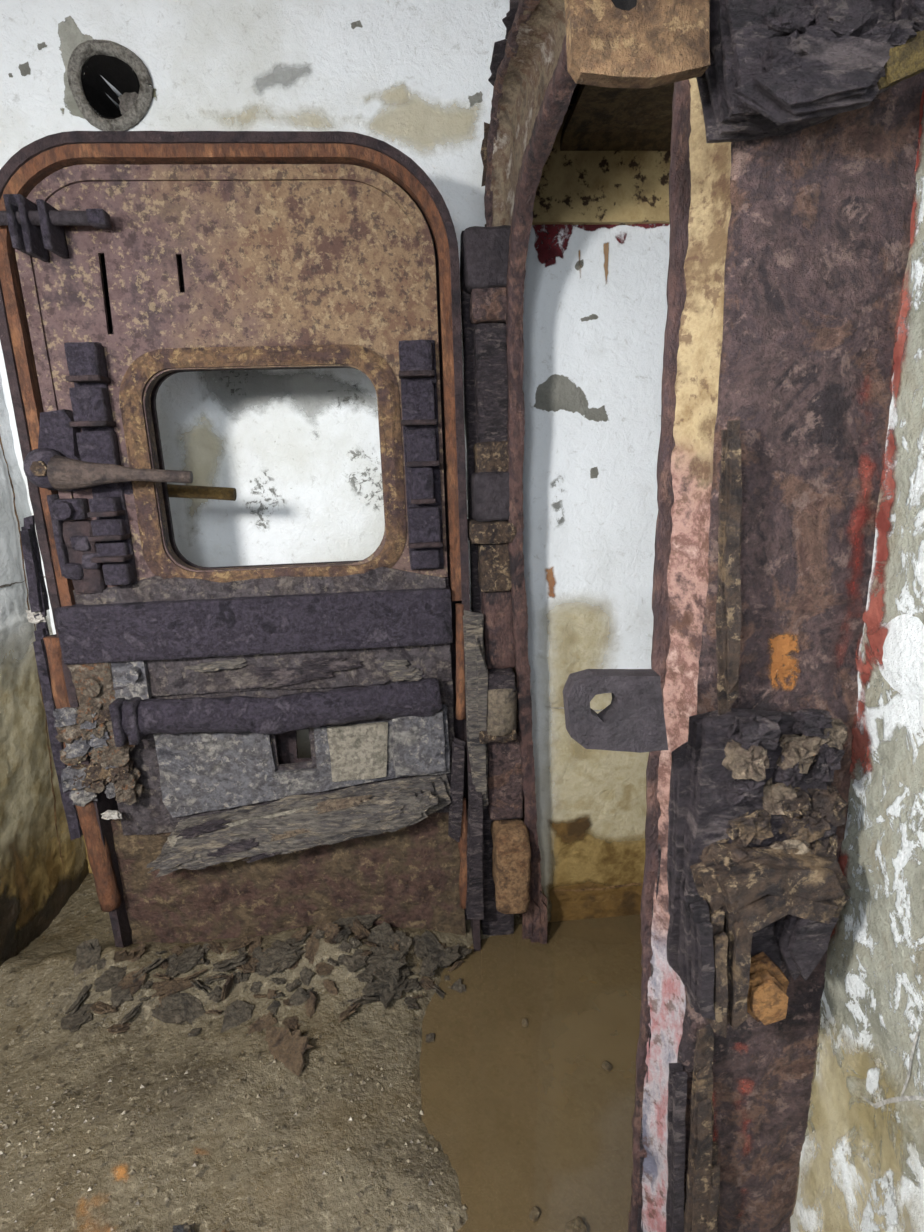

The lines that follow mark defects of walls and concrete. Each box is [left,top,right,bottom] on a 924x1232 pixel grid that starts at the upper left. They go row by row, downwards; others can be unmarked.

flaking render [534,374,608,422]
crack [0,436,66,877]
damp [0,646,92,967]
damp [548,603,649,922]
peeling [816,625,924,1186]